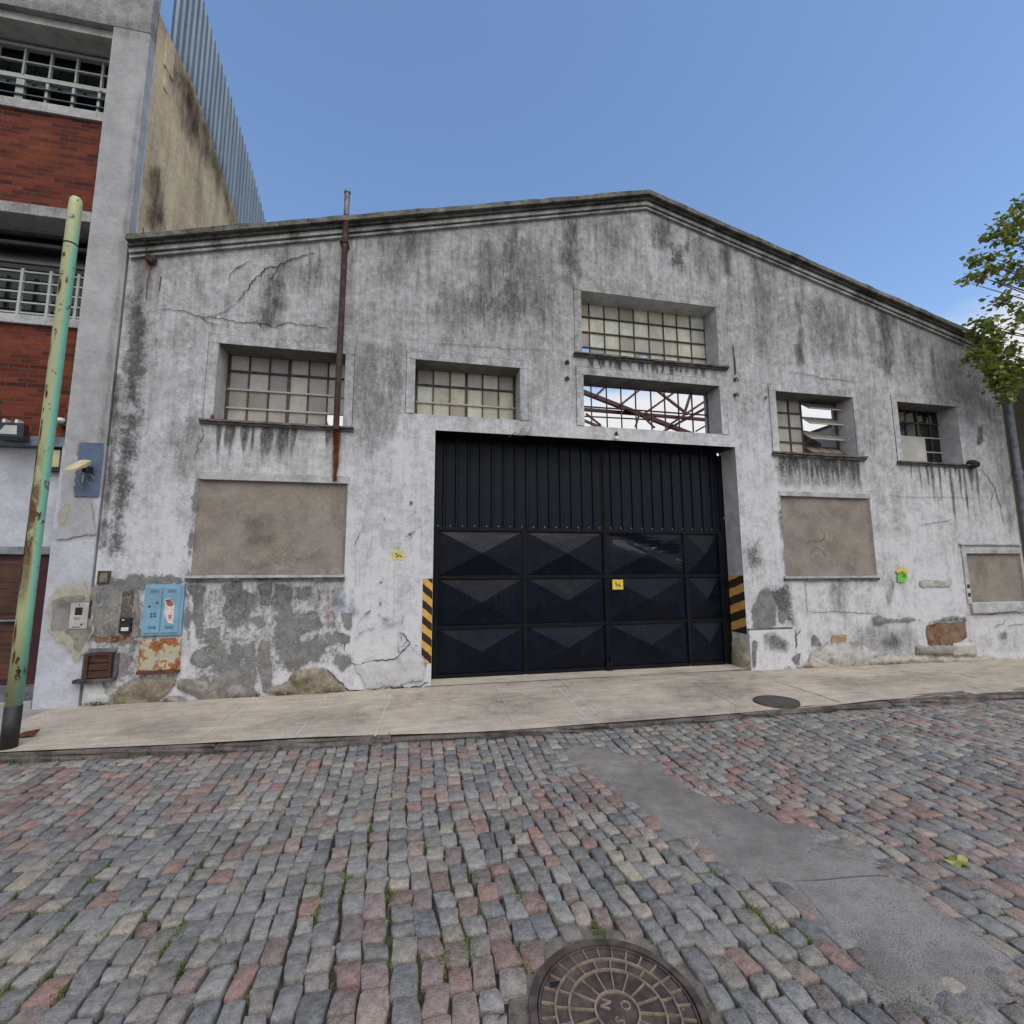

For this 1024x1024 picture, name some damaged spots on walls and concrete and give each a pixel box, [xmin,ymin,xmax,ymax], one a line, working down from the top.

leakage [654,227,689,272]
crack [162,253,333,329]
leakage [102,286,153,561]
leakage [216,425,297,453]
leakage [779,457,860,476]
leakage [911,465,979,513]
peeling [48,478,353,706]
crack [328,632,427,691]
peeling [751,588,788,668]
flaking render [792,615,967,666]